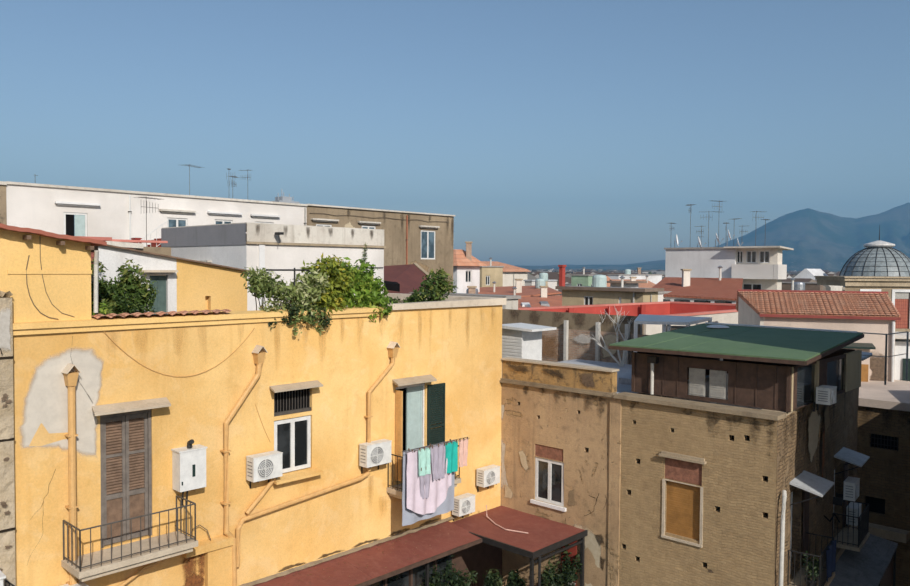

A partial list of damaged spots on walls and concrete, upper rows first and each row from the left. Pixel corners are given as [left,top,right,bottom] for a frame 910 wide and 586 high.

flaking render [21,349,103,455]
damp [576,373,605,410]